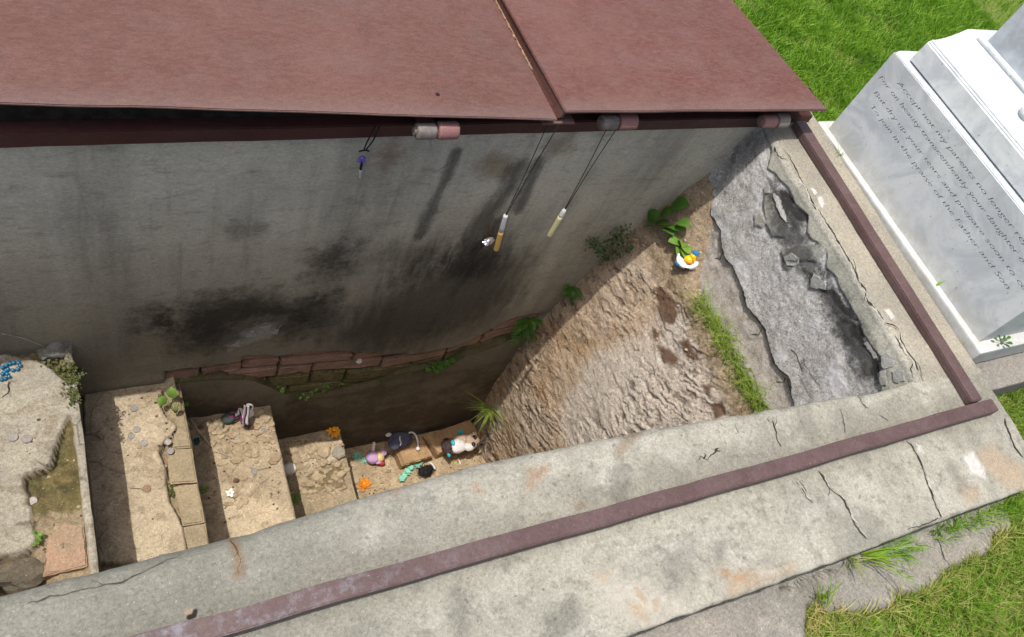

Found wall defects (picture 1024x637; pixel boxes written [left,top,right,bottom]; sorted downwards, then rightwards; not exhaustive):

spalling [764,185,787,222]
spalling [784,253,800,266]
spalling [810,273,827,290]
crack [773,147,924,381]
damp [181,295,326,346]
crack [710,207,819,446]
spalling [122,313,539,415]
crack [1004,418,1024,458]
crack [796,470,868,539]
crack [908,440,950,566]
crack [28,536,178,603]